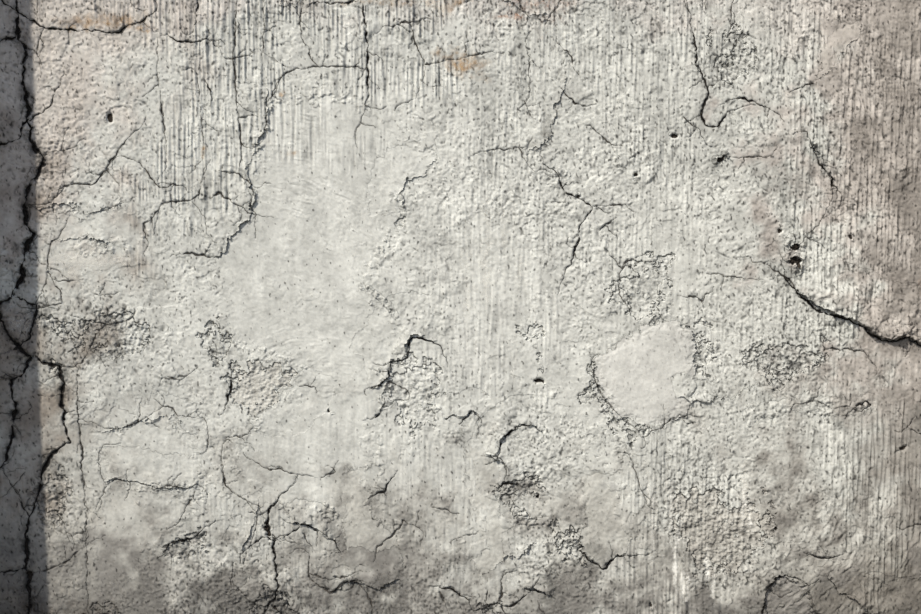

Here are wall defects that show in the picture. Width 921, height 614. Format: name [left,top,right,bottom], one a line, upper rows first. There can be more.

crack [521,0,623,156]
crack [468,139,645,311]
crack [683,1,921,370]
spalling [33,310,150,360]
crack [0,0,502,614]
crack [445,411,543,490]
crack [577,354,696,510]
crack [434,569,555,613]
crack [573,533,649,570]
crack [762,547,843,614]